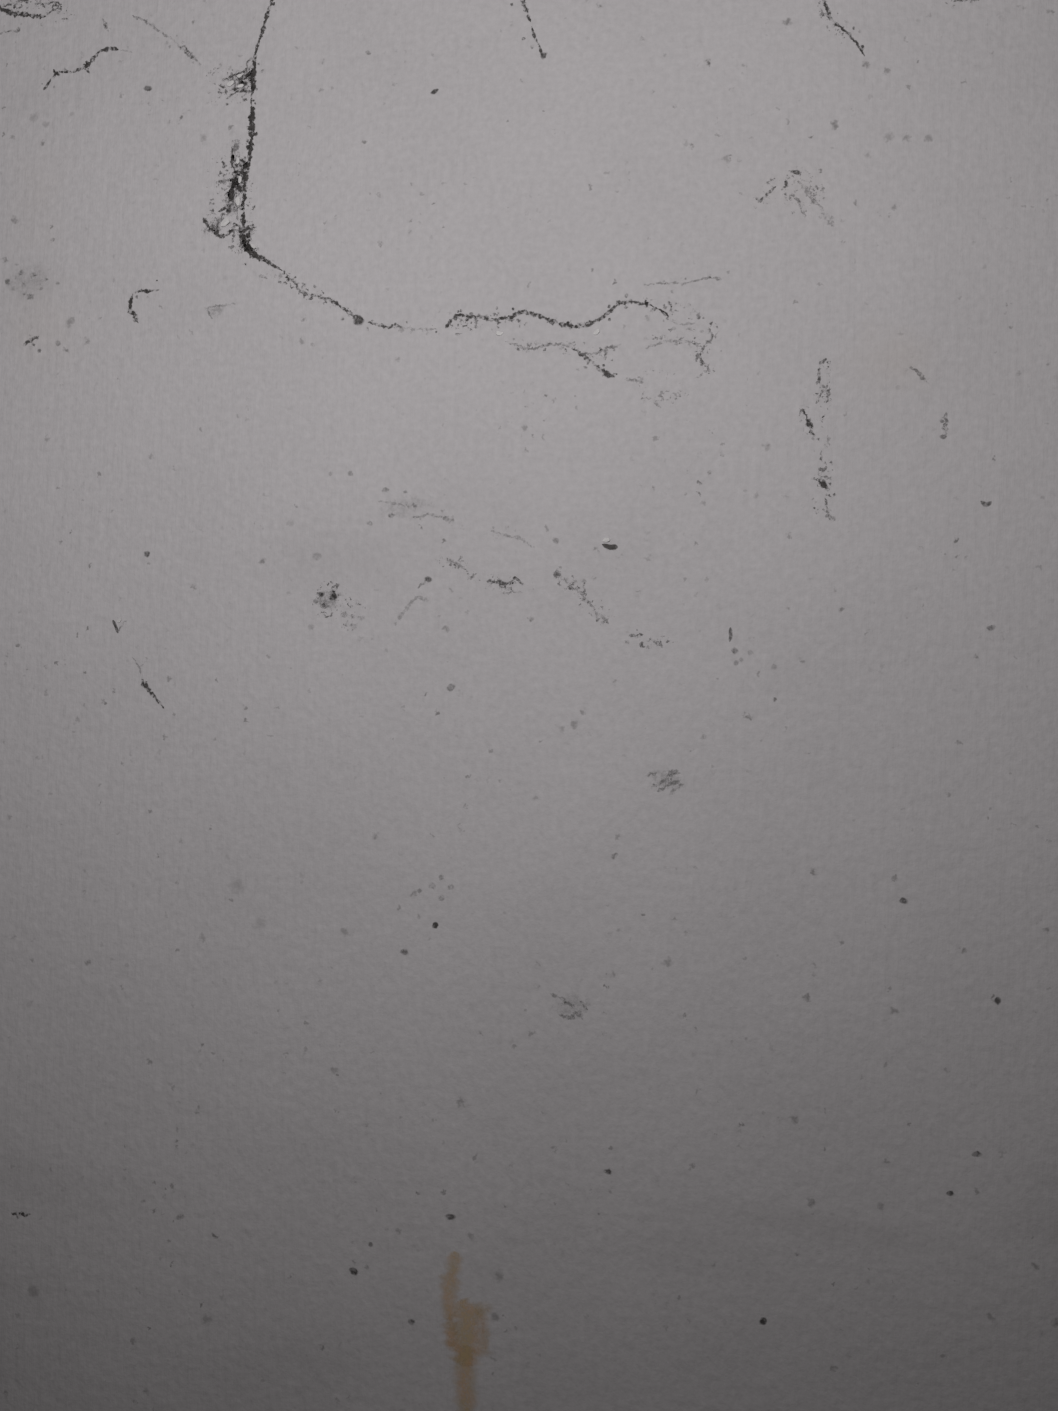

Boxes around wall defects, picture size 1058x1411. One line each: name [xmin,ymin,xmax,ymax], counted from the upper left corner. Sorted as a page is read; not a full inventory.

crack [0,0,67,19]
crack [511,0,546,58]
crack [823,2,865,56]
crack [203,0,399,329]
crack [435,300,672,378]